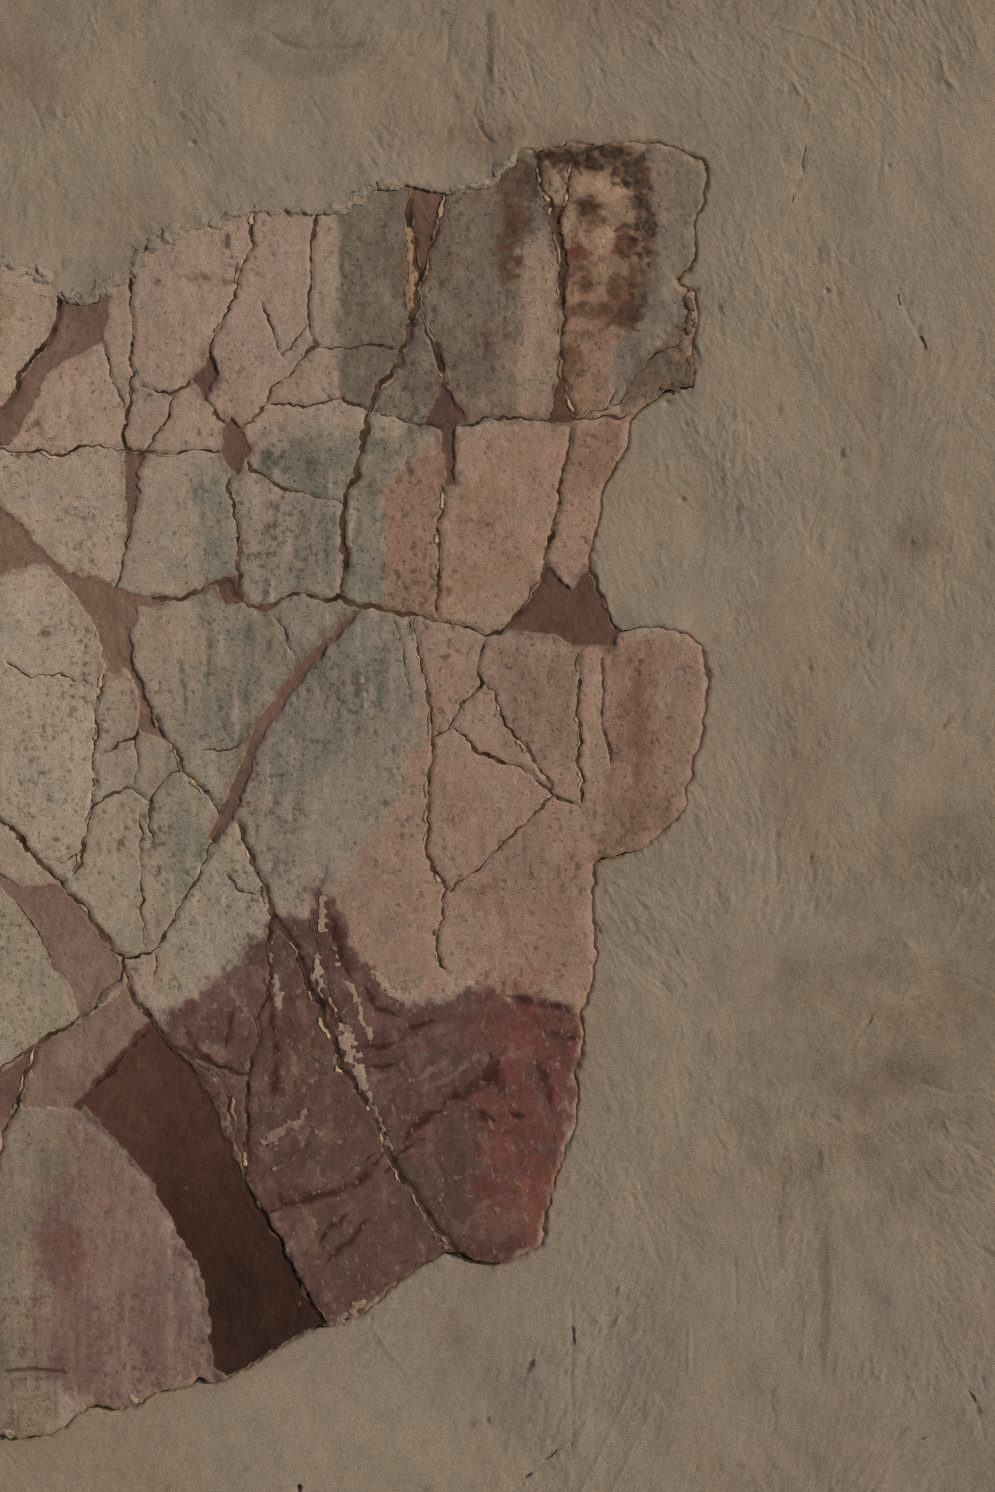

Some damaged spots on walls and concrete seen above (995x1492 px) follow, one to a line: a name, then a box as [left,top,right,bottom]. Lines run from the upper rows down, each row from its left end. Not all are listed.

spalling [404,227,416,310]
spalling [677,287,699,336]
crack [0,154,684,970]
crack [0,661,461,1325]
peeling [268,942,284,1010]
peeling [310,895,393,1151]
peeling [370,970,474,1002]
peeling [260,1108,319,1153]
spalling [335,1299,367,1326]